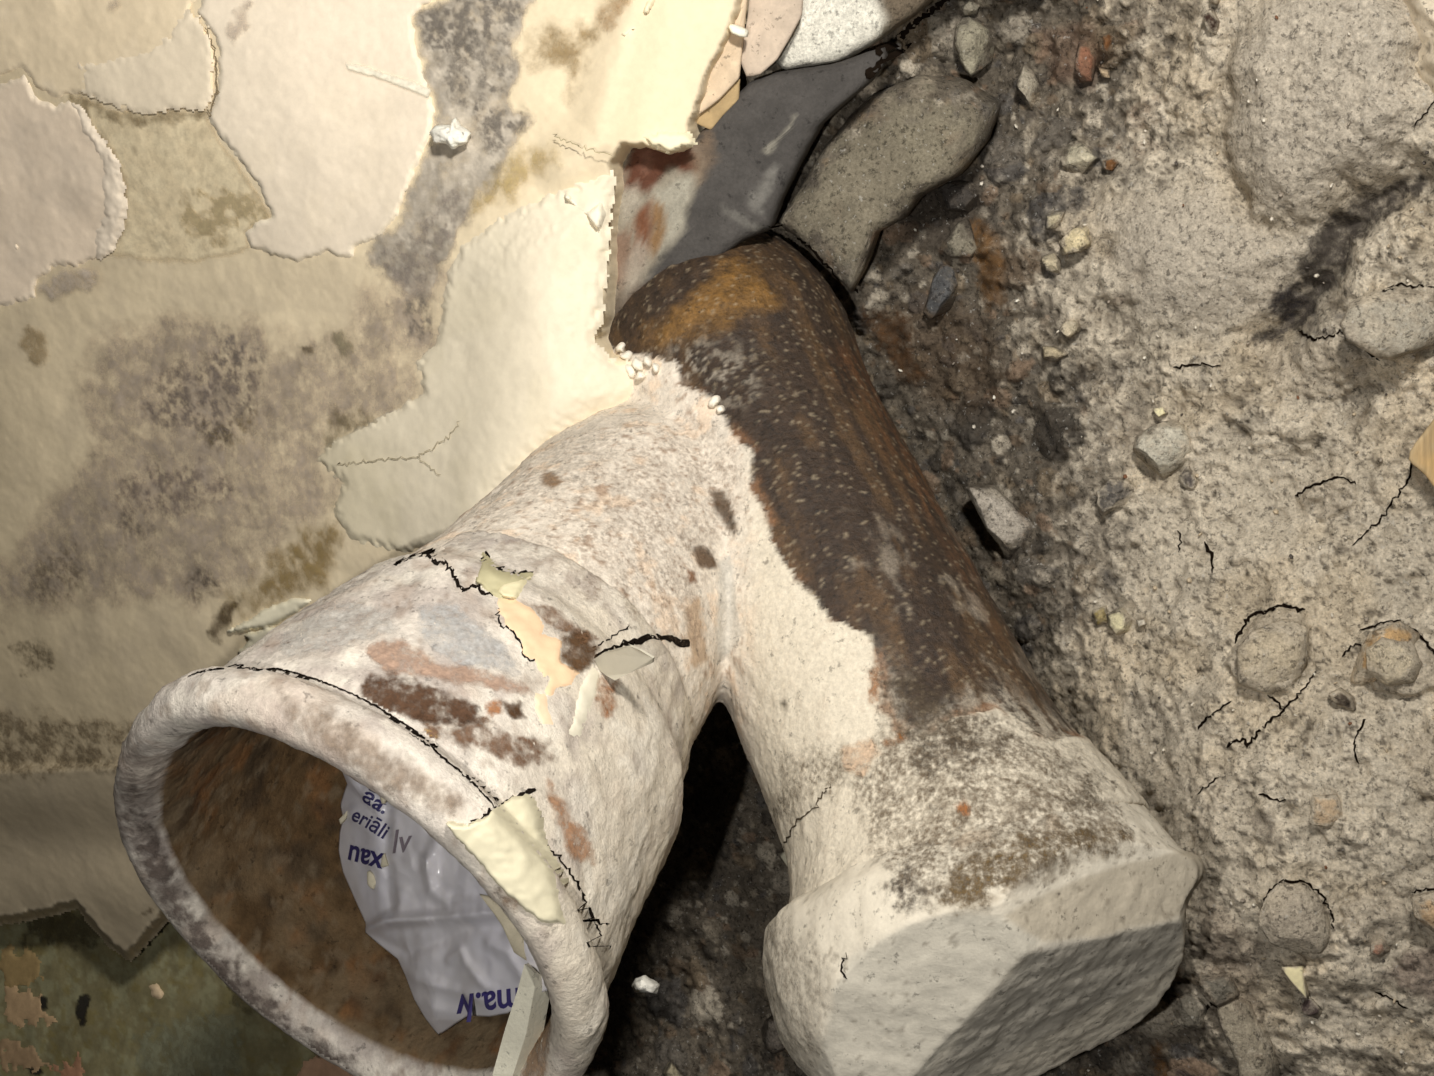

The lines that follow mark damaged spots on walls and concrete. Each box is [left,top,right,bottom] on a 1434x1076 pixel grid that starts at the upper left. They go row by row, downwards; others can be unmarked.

peeling [0,0,435,306]
damp [0,0,544,600]
damp [207,602,237,636]
crack [393,548,535,661]
crack [593,625,690,658]
crack [1235,603,1305,644]
crack [1198,620,1434,794]
crack [547,845,611,949]
peeling [0,944,85,1076]
hole [76,994,90,1026]
peeling [149,983,164,999]
peeling [297,1055,353,1076]